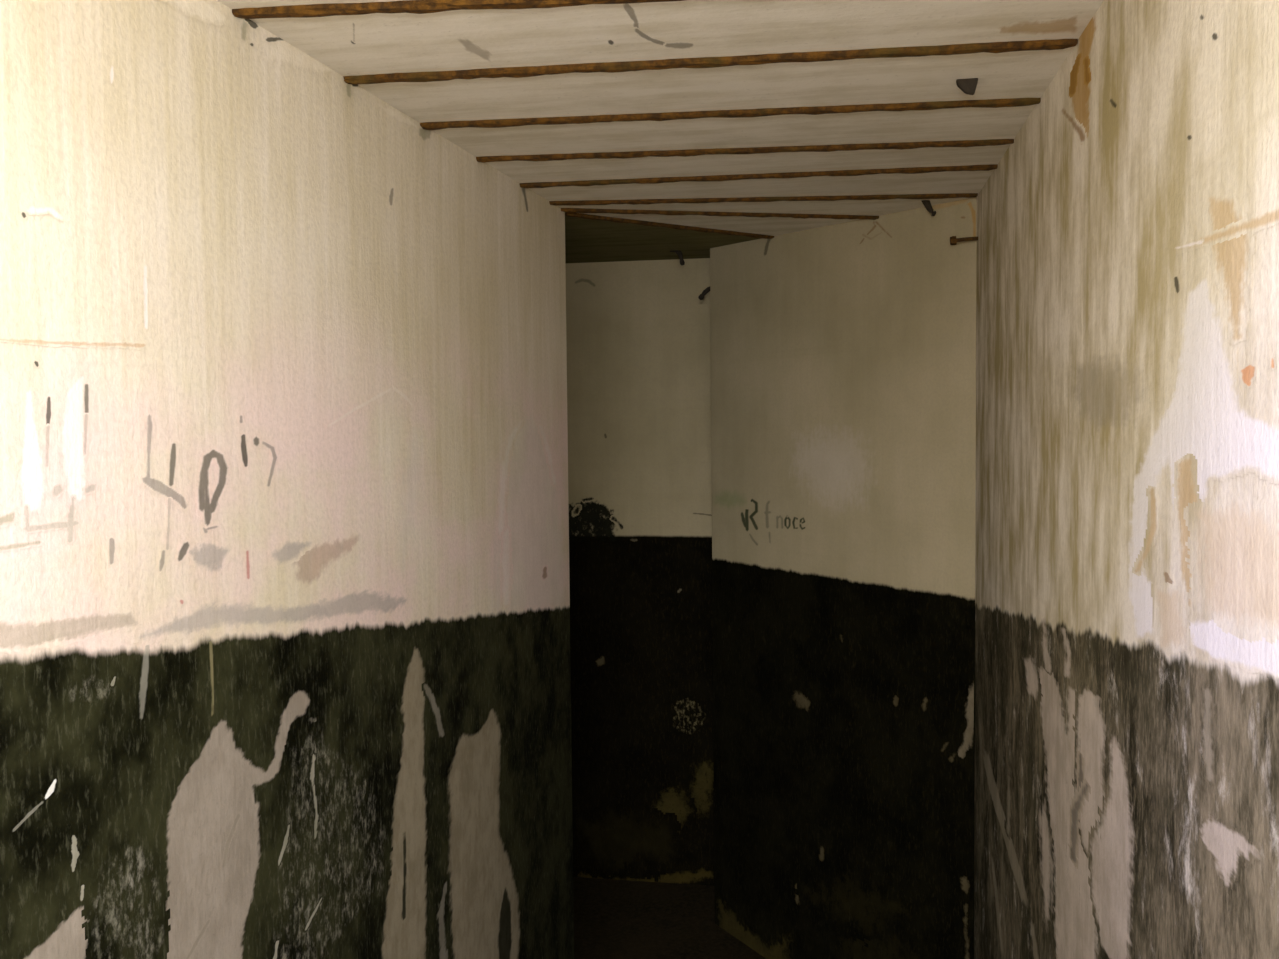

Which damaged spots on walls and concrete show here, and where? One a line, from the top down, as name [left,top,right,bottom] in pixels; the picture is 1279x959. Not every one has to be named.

damp [1060,190,1279,681]
spalling [1172,275,1181,295]
peeling [21,644,522,959]
peeling [939,616,1139,959]
peeling [1199,683,1218,786]
peeling [1198,812,1262,895]